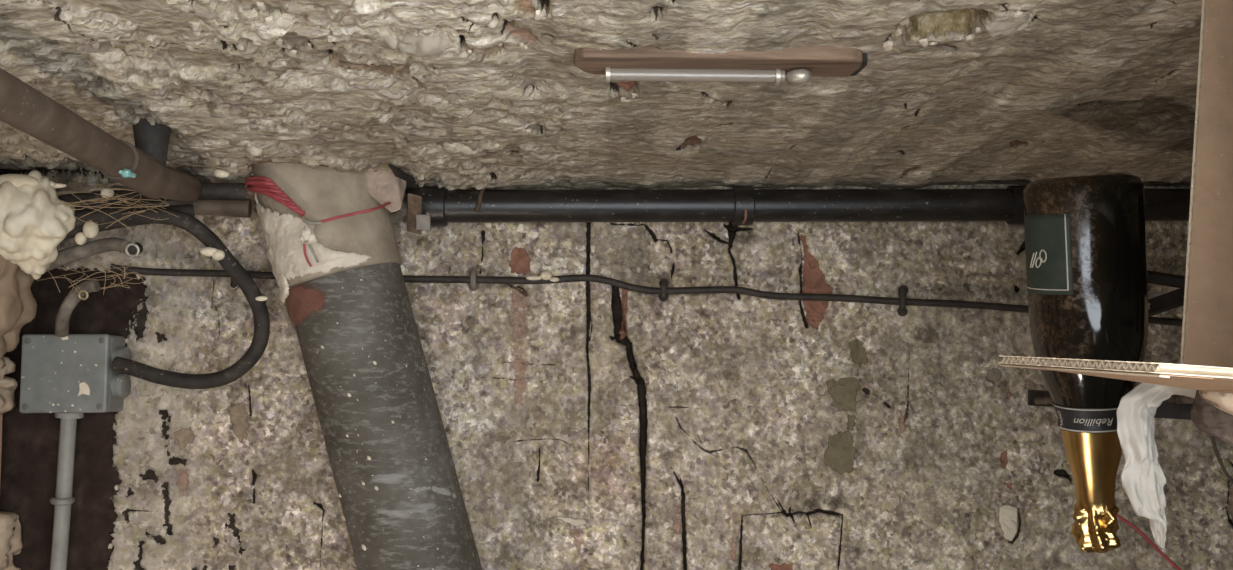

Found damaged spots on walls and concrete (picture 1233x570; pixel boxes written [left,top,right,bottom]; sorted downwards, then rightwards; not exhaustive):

spalling [883,8,1033,54]
flaking render [610,81,638,103]
flaking render [800,234,833,330]
crack [481,362,556,383]
crack [503,222,843,570]